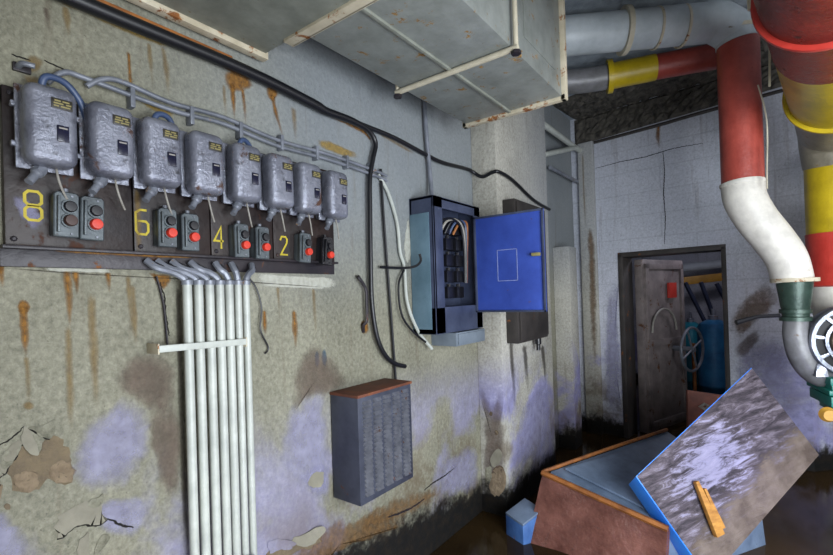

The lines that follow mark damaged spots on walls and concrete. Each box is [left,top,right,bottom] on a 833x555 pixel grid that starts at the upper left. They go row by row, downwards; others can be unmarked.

rust [227,72,250,108]
rust [267,88,280,125]
rust [65,272,78,315]
rust [18,301,30,348]
water stain [156,293,186,503]
crack [0,425,56,486]
flaking render [0,420,77,510]
water stain [103,504,135,527]
spalling [266,526,326,555]